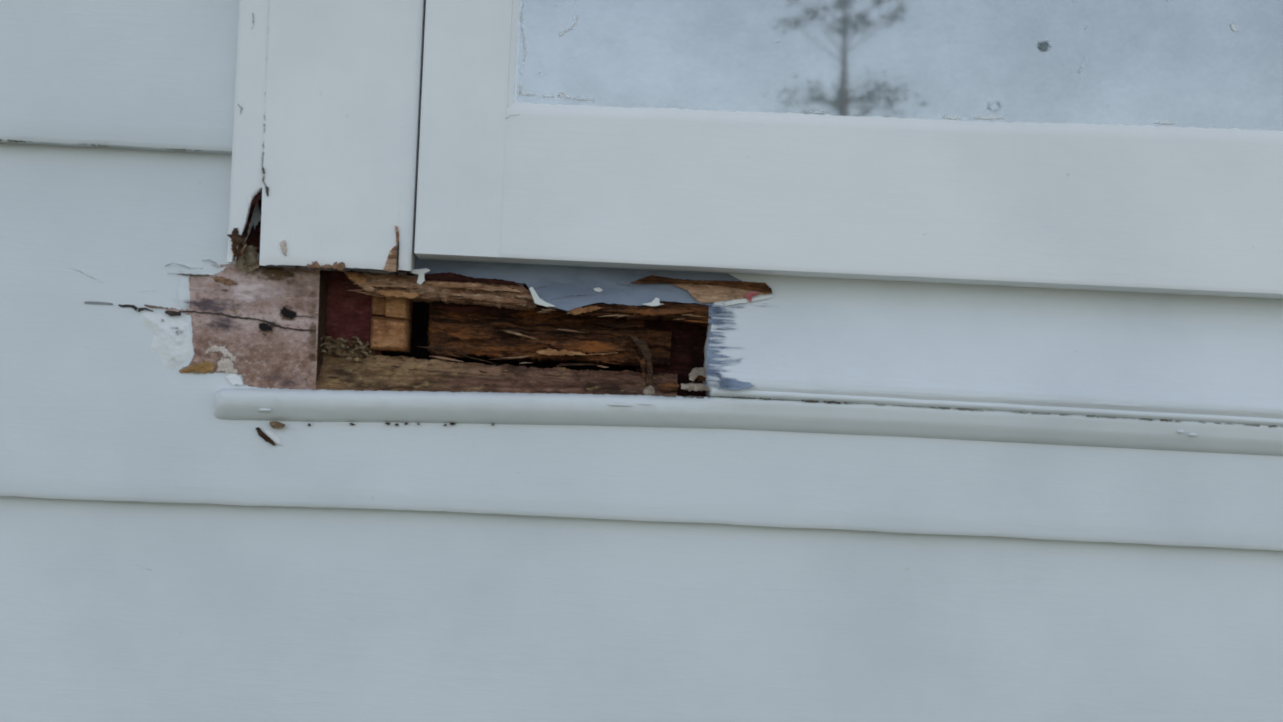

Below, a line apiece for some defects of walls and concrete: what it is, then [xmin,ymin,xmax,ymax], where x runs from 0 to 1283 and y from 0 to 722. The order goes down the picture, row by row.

spalling [239,193,262,248]
crack [165,259,219,276]
peeling [411,268,430,285]
peeling [529,287,555,307]
peeling [631,275,775,306]
crack [84,301,316,332]
peeling [166,240,346,390]